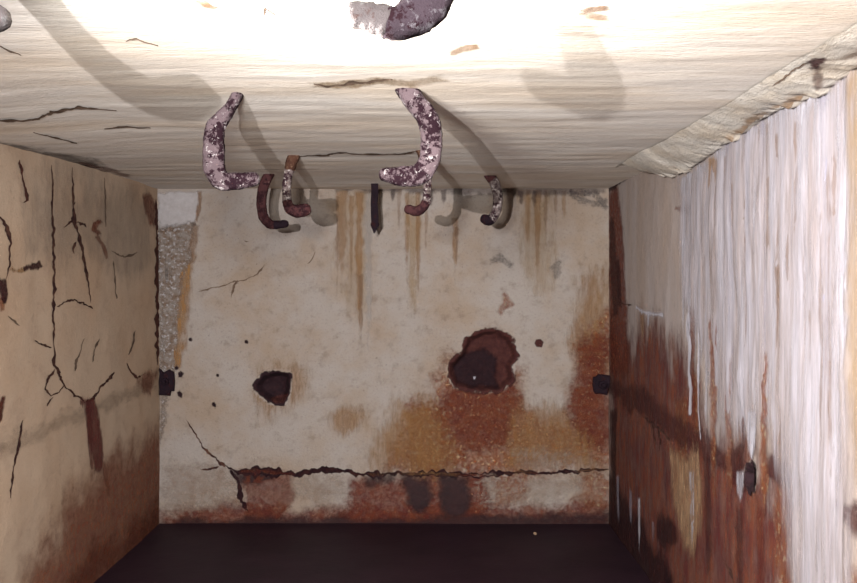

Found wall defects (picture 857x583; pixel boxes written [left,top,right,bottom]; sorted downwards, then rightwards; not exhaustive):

crack [0,106,149,144]
crack [18,160,29,203]
crack [0,217,18,325]
crack [35,165,115,406]
crack [112,195,160,365]
spalling [158,191,201,377]
spalling [252,370,293,406]
rust [30,187,793,583]
spalling [447,328,520,395]
water stain [609,79,857,583]
crack [10,420,23,498]
crack [187,421,608,511]